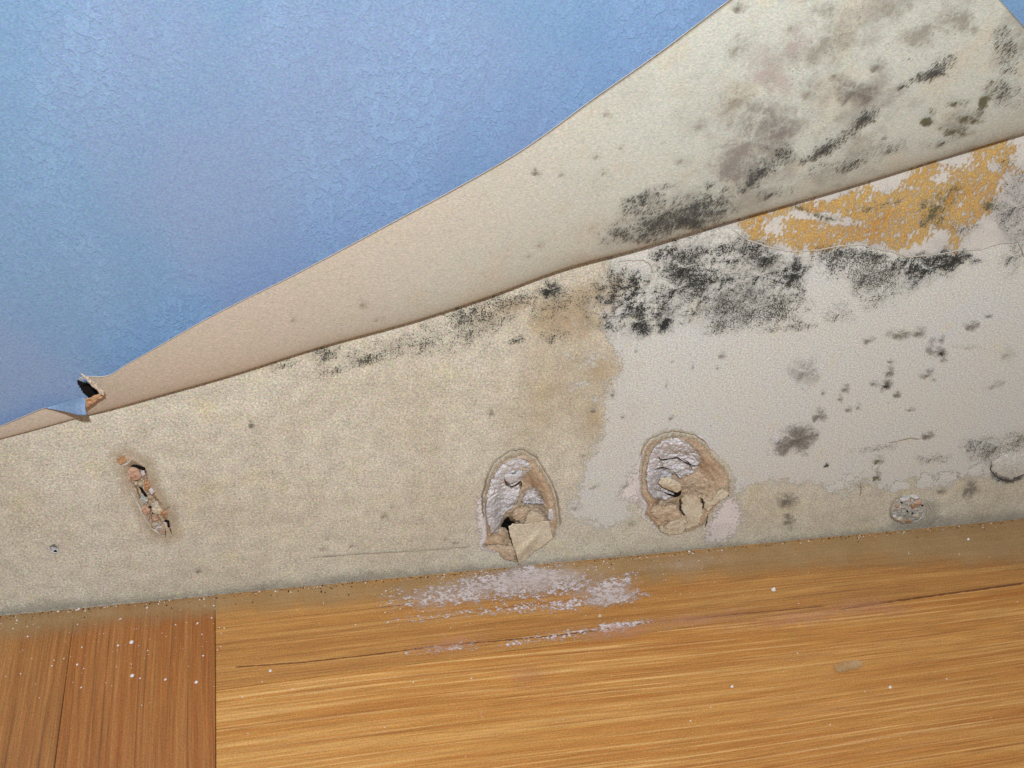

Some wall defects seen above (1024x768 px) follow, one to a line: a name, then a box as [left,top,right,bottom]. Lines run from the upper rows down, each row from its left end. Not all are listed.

water stain [897,54,958,90]
water stain [920,25,1024,147]
peeling [0,0,1024,564]
water stain [315,74,981,375]
water stain [983,152,1024,274]
water stain [775,411,826,456]
water stain [964,432,1024,464]